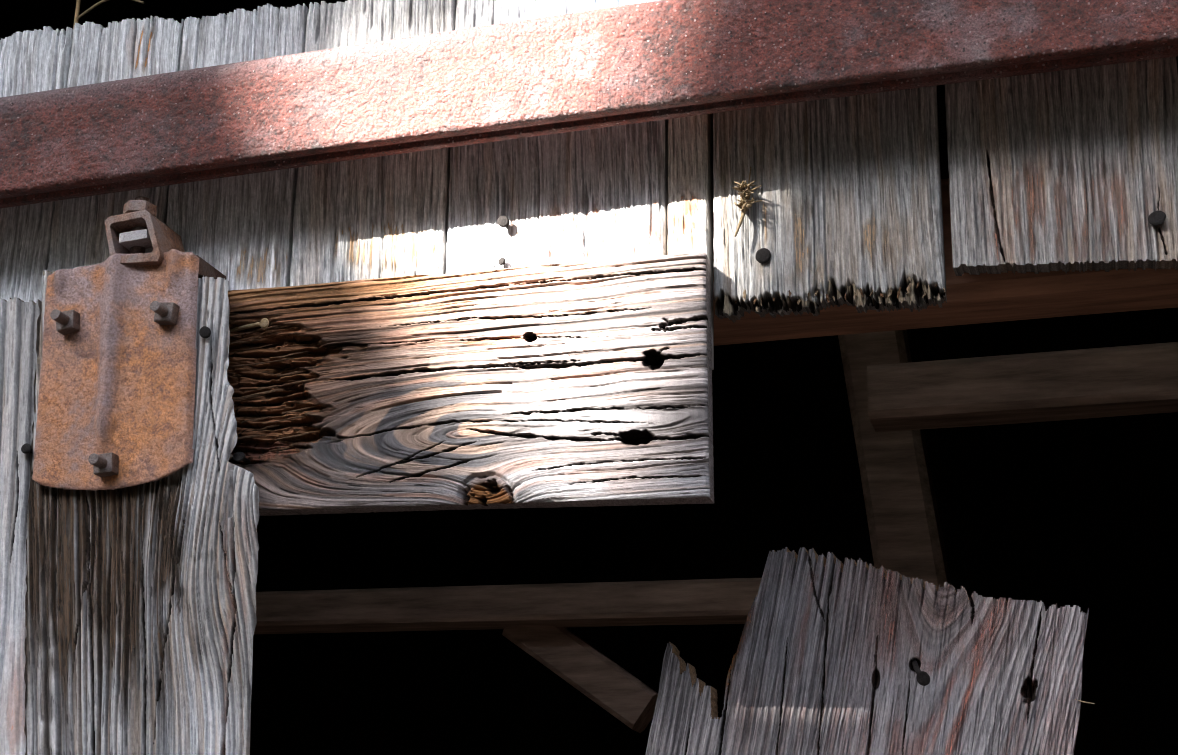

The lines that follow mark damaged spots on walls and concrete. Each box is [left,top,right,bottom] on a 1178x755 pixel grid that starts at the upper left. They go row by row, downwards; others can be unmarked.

corrosion [135,31,153,69]
corrosion [672,193,697,240]
corrosion [794,211,823,277]
corrosion [993,164,1127,261]
crack [234,268,707,381]
crack [332,406,709,485]
crack [808,551,833,755]